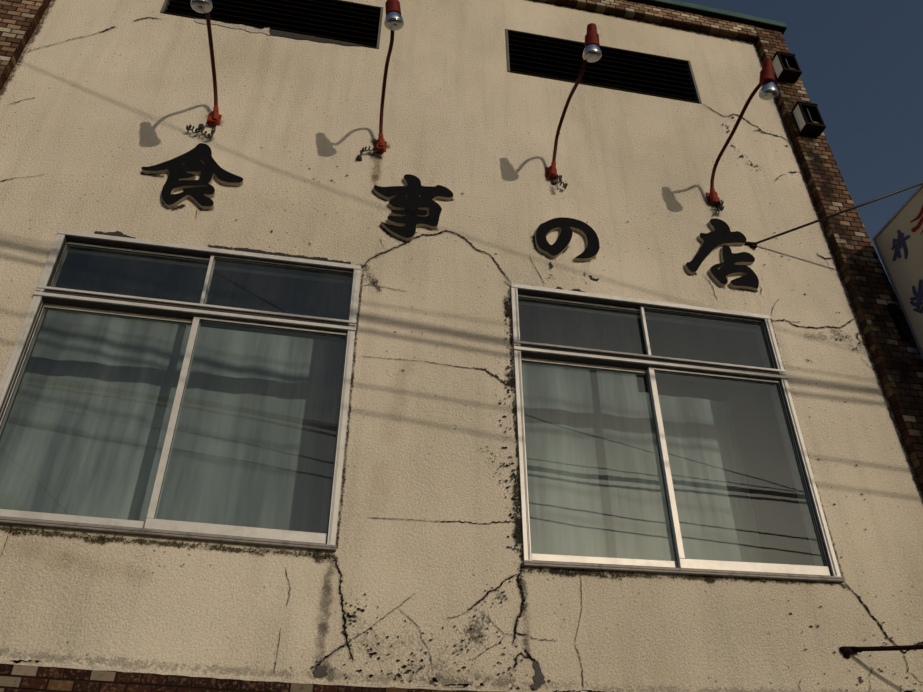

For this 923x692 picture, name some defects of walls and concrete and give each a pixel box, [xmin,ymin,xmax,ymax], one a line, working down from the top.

crack [704,104,791,146]
crack [361,230,511,291]
crack [366,356,511,386]
crack [760,287,875,369]
damp [0,264,381,681]
damp [503,290,848,612]
crack [311,557,432,669]
crack [447,567,584,690]
crack [844,582,923,683]